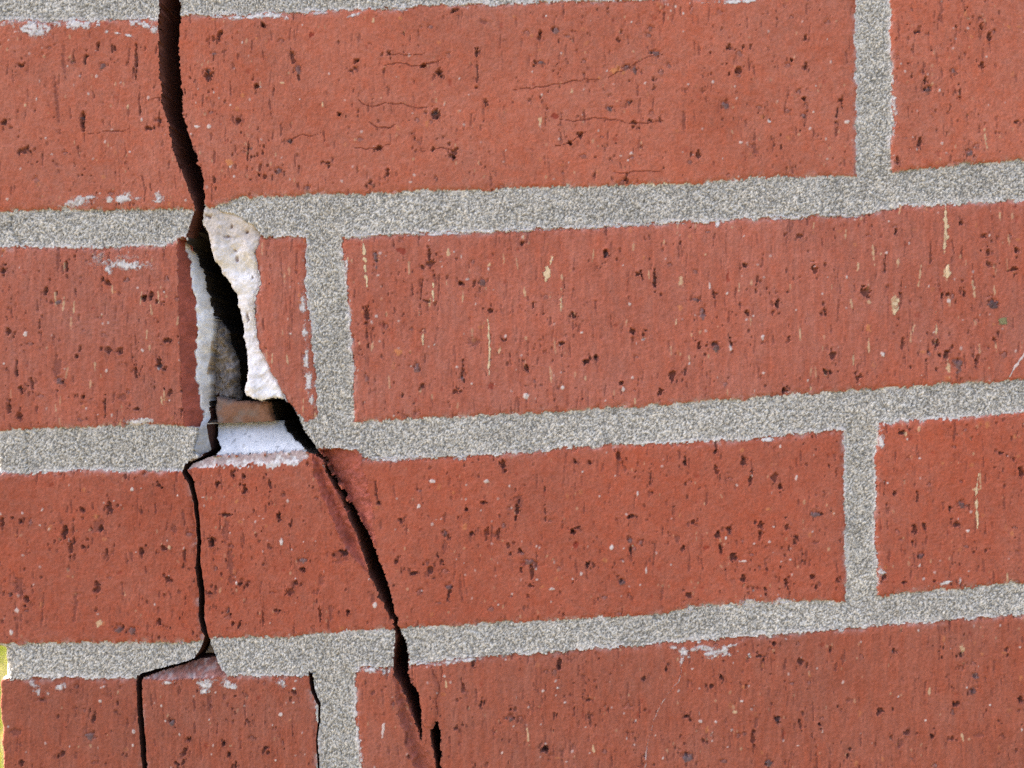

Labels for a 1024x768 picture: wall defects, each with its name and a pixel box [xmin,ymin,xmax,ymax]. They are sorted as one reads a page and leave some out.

spalling [176,204,422,572]
crack [136,0,467,768]